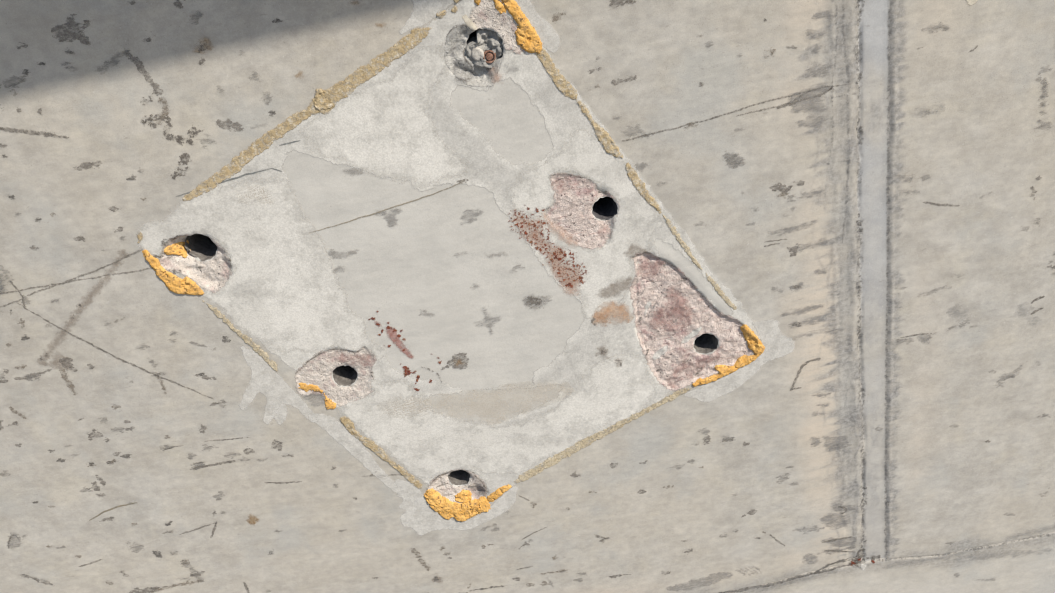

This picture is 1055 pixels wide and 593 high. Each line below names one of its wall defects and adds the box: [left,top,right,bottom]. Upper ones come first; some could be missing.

crack [622,0,890,232]
crack [1,250,153,307]
spalling [154,234,231,293]
corrosion [507,207,587,292]
spalling [544,173,619,250]
spalling [295,347,376,406]
corrosion [368,311,441,391]
spalling [603,246,753,391]
spalling [427,469,488,503]